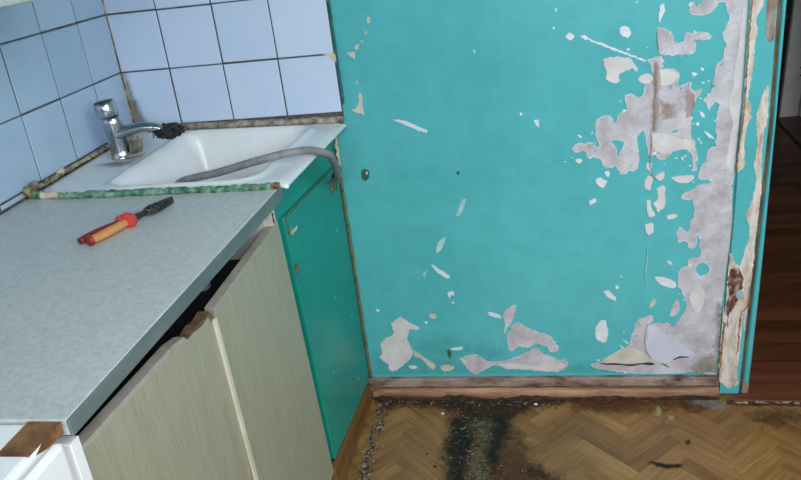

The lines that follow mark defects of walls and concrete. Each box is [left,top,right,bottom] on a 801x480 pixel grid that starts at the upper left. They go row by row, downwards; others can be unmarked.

peeling [352,80,365,115]
peeling [564,0,778,375]
peeling [379,305,568,374]
corrosion [694,317,729,378]
leakage [482,414,512,475]